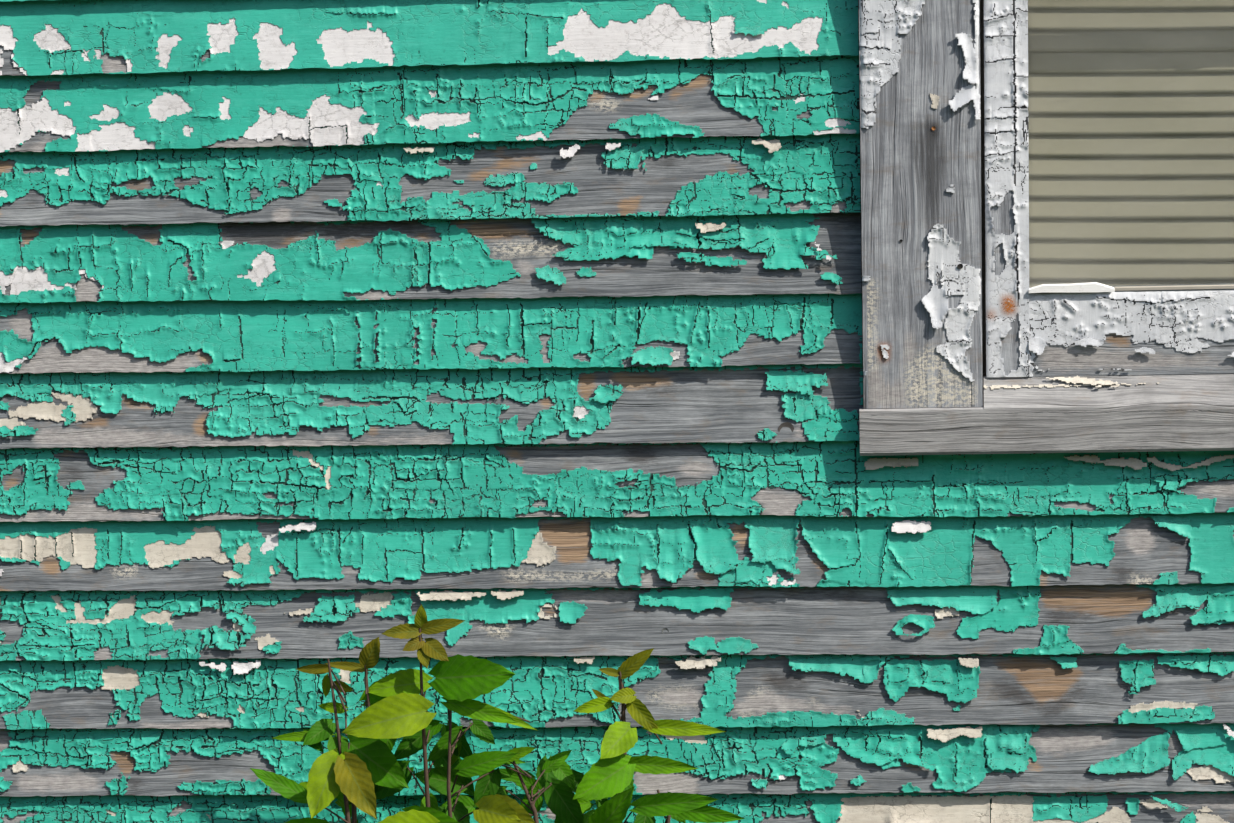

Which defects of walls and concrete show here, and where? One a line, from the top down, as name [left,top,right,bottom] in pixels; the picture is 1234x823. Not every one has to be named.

peeling [0,0,1234,512]
crack [929,0,1234,377]
crack [0,276,1234,823]
peeling [0,390,1234,823]